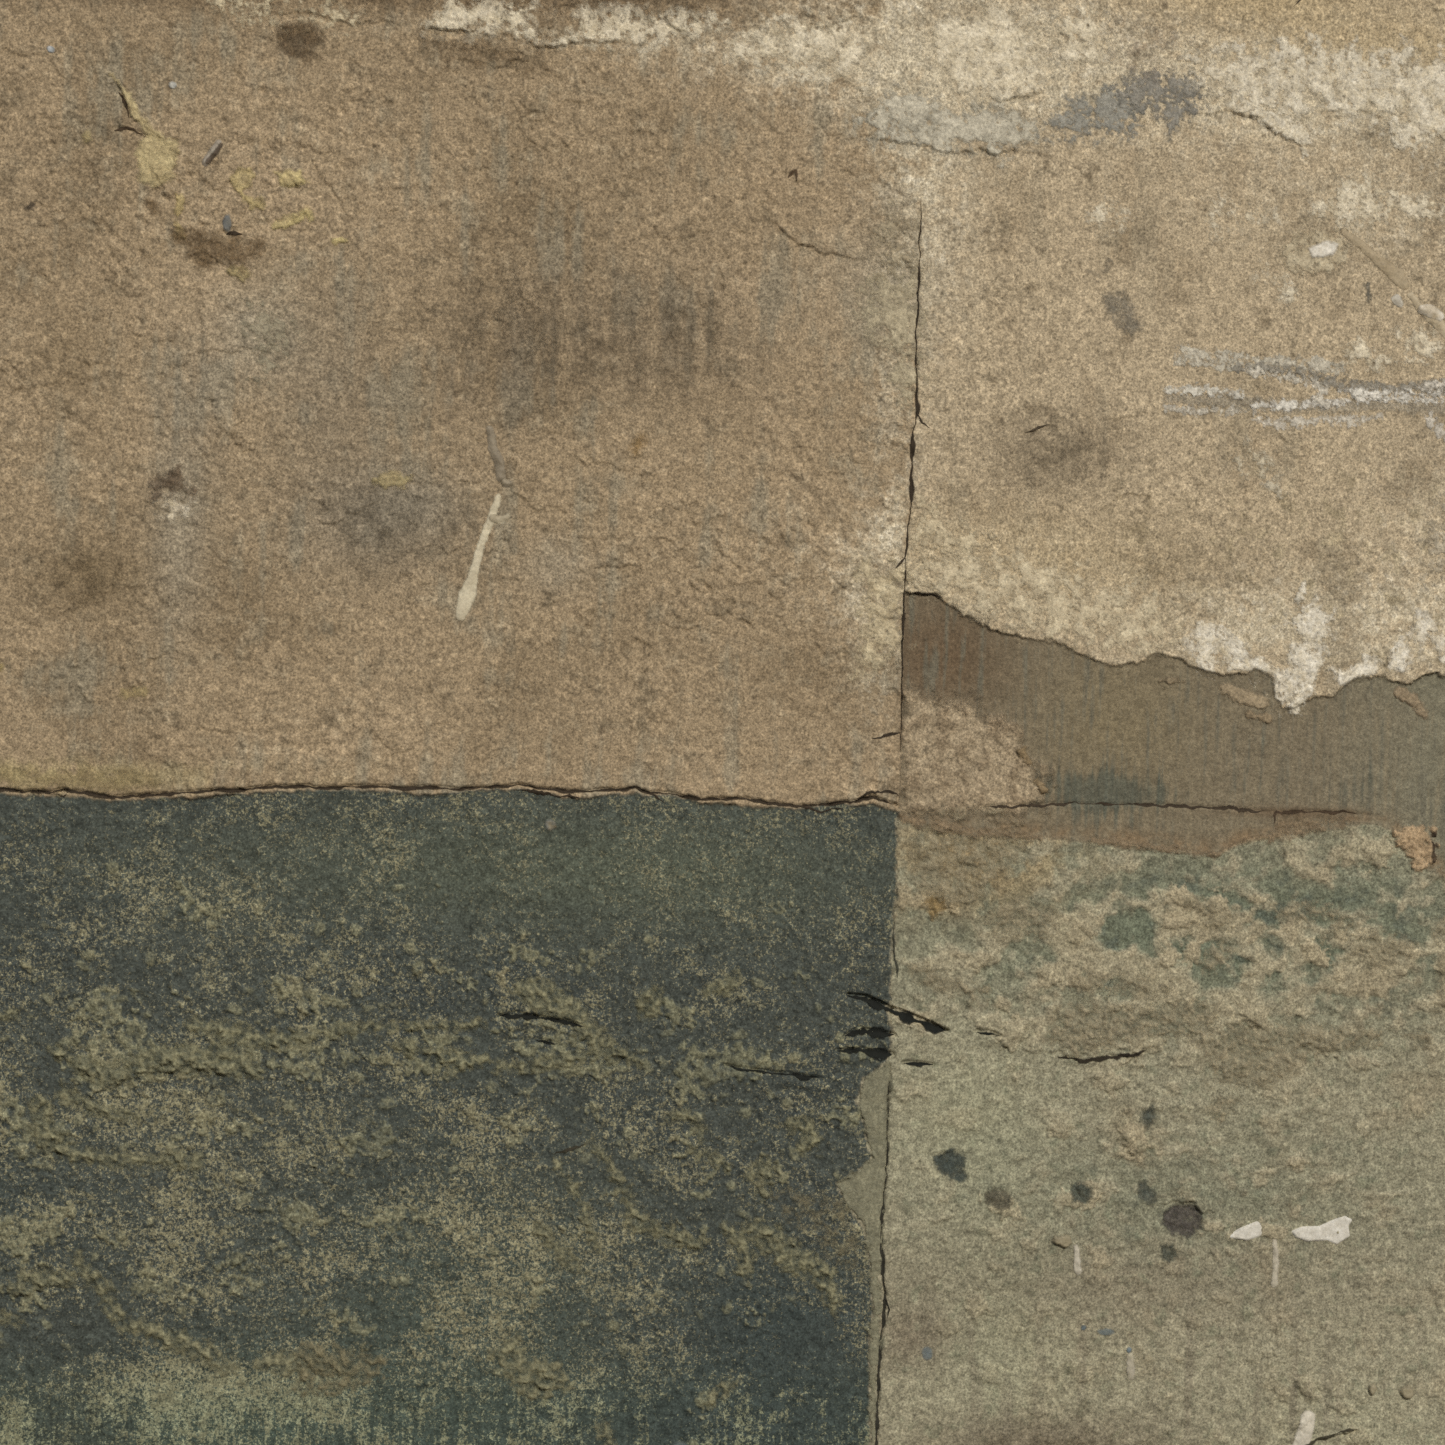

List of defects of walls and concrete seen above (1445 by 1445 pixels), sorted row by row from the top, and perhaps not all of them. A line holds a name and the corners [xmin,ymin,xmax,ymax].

crack [872,208,941,739]
crack [0,784,898,813]
spalling [899,592,1445,877]
crack [892,921,900,978]
crack [554,1143,588,1154]
crack [875,1081,890,1445]